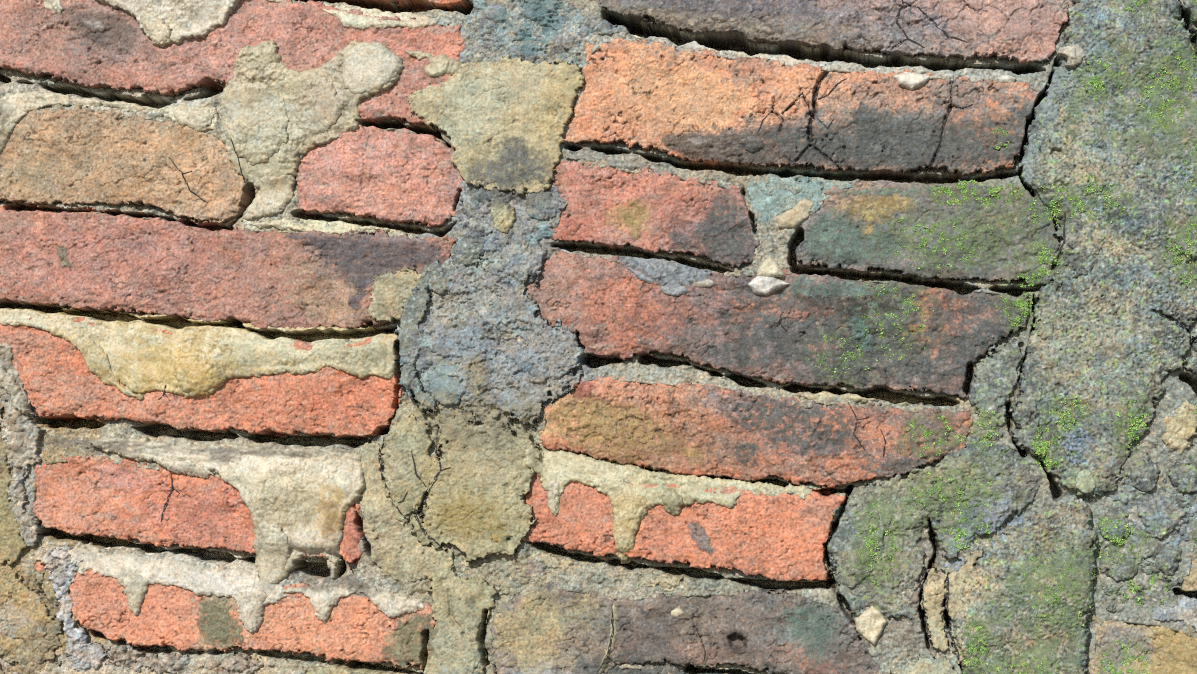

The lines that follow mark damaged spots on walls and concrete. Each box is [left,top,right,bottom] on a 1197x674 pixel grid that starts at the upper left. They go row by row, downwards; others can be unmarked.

crack [757,72,847,170]
crack [921,75,973,171]
crack [378,433,451,551]
crack [914,521,965,674]